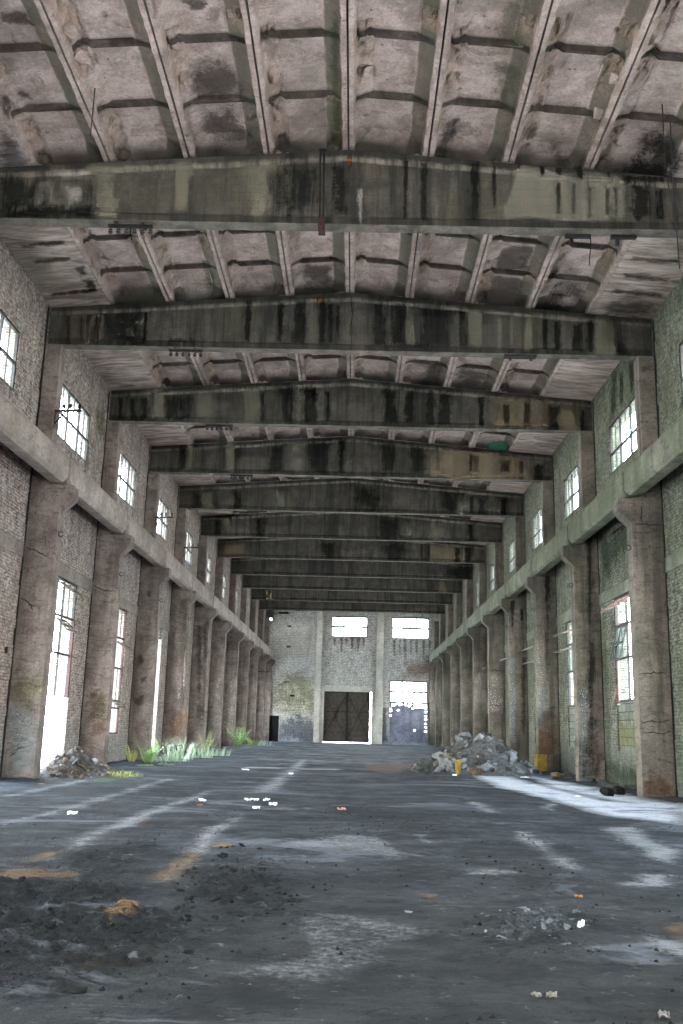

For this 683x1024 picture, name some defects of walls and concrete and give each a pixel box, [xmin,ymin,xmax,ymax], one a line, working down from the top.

spalling [63,22,91,65]
water stain [191,60,250,153]
water stain [248,162,319,218]
water stain [332,164,349,214]
water stain [616,131,679,221]
water stain [277,300,340,344]
water stain [372,246,667,416]